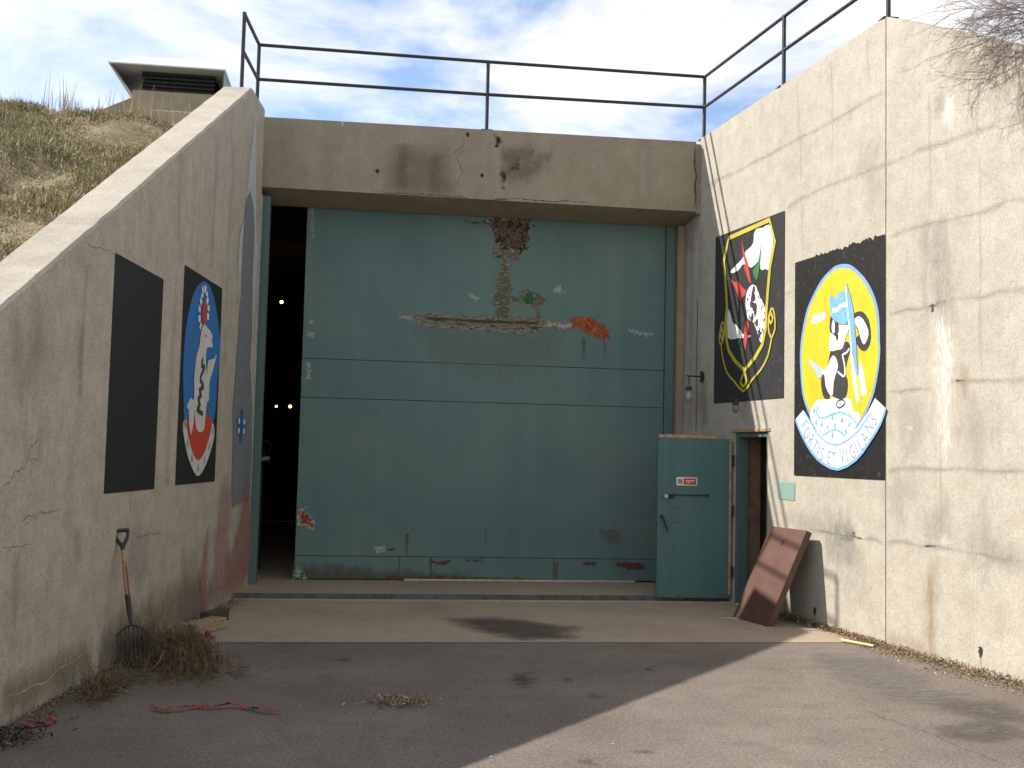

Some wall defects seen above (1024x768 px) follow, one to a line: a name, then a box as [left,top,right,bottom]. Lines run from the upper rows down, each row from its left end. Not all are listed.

crack [691,146,699,205]
peeling [398,217,565,335]
corrosion [545,316,611,340]